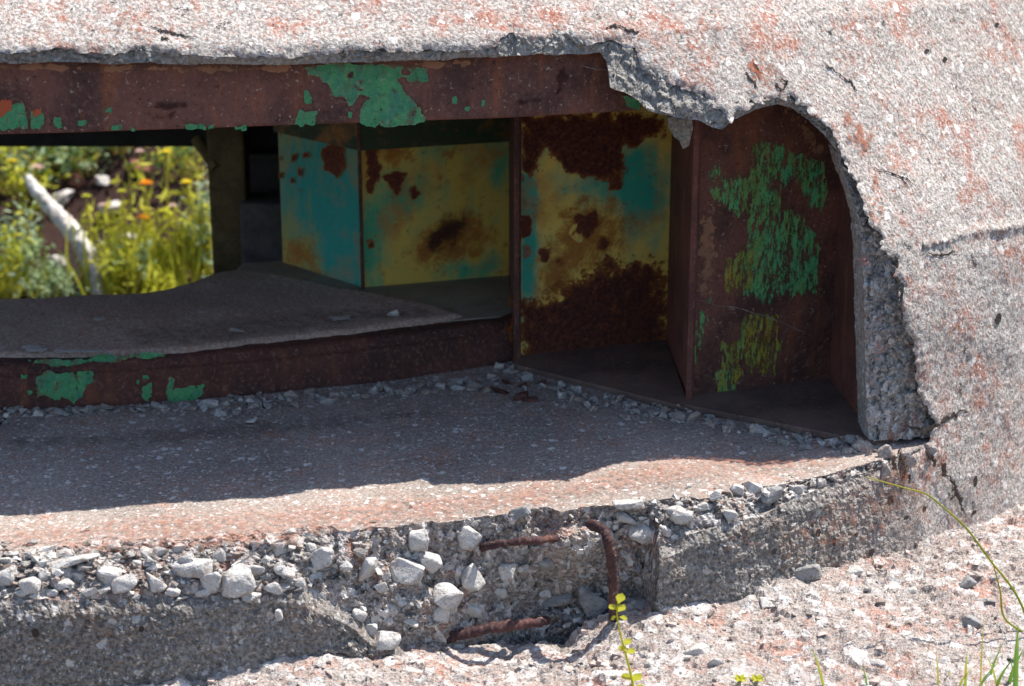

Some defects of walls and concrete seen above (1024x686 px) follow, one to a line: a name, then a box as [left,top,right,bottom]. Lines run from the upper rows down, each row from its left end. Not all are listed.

rust [0,99,12,117]
rust [278,144,346,184]
rust [365,148,422,200]
rust [417,212,491,262]
spalling [0,28,935,455]
rust [504,99,668,361]
crack [891,409,972,516]
spalling [0,444,918,653]